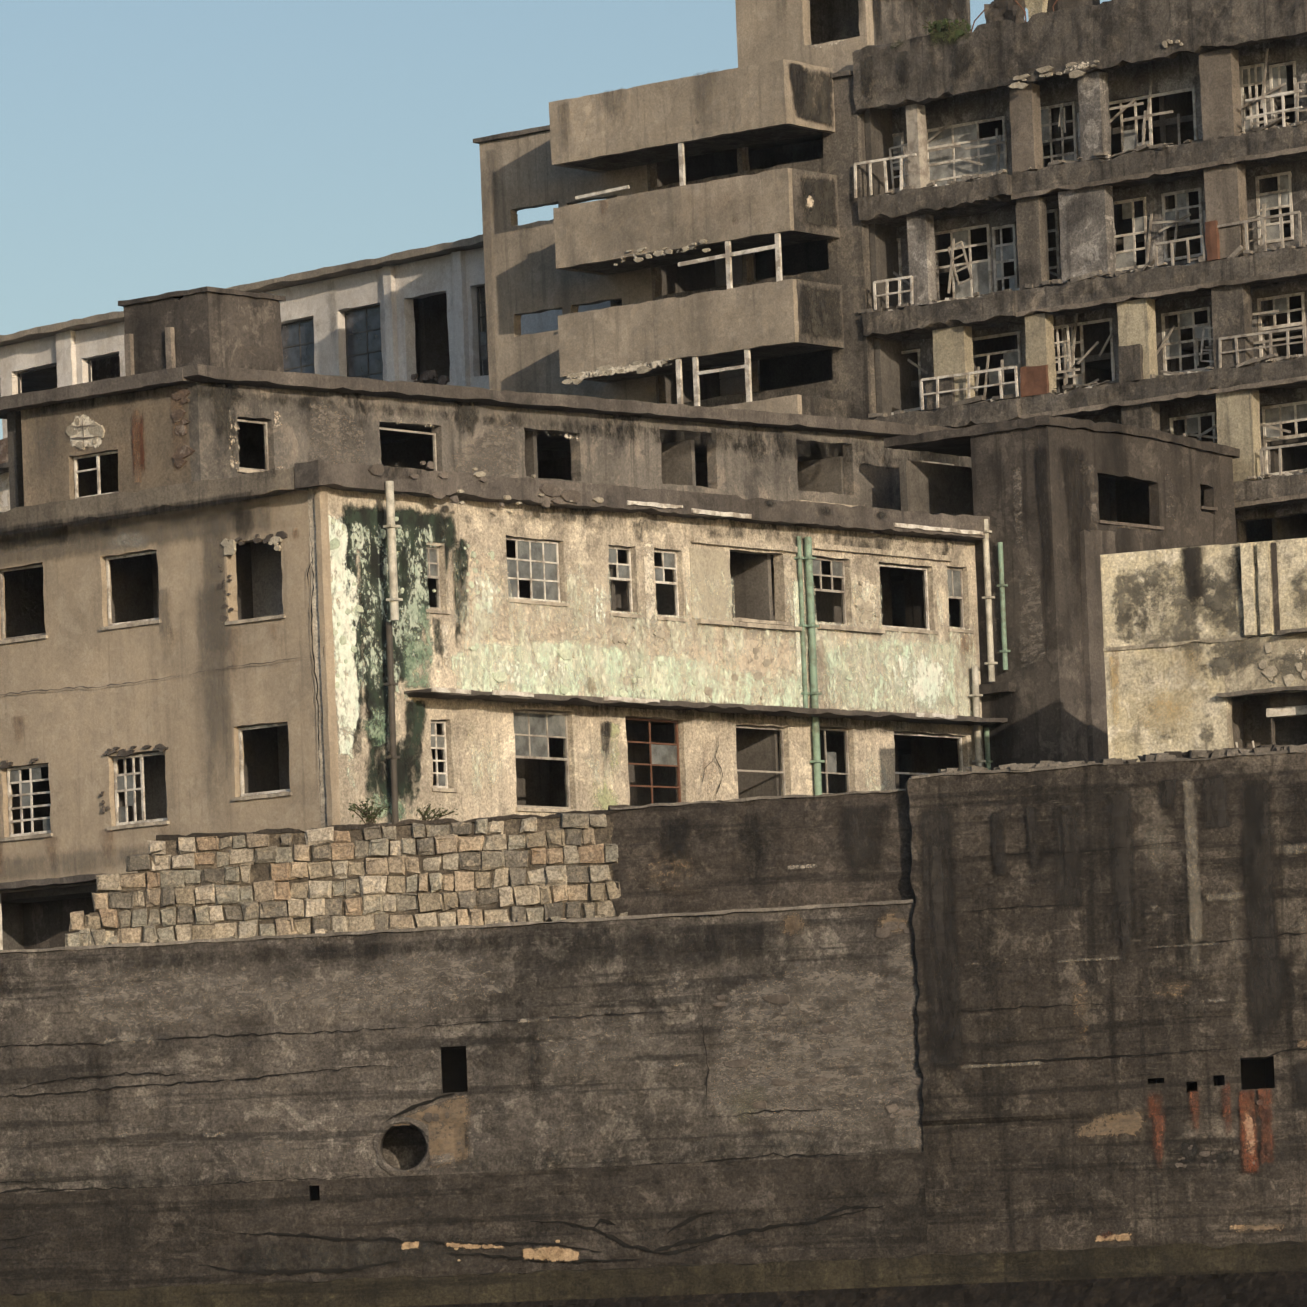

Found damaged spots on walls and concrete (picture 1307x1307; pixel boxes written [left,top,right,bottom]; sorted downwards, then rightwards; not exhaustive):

spalling [1009,60,1099,89]
rust [411,370,449,385]
spalling [562,358,671,385]
water stain [340,517,388,780]
water stain [434,538,468,665]
peeling [440,542,975,716]
water stain [1112,546,1261,678]
water stain [404,700,427,791]
rust [1149,1096,1165,1160]
rust [1223,1083,1274,1173]
crack [199,1205,885,1276]
spalling [523,1240,579,1262]